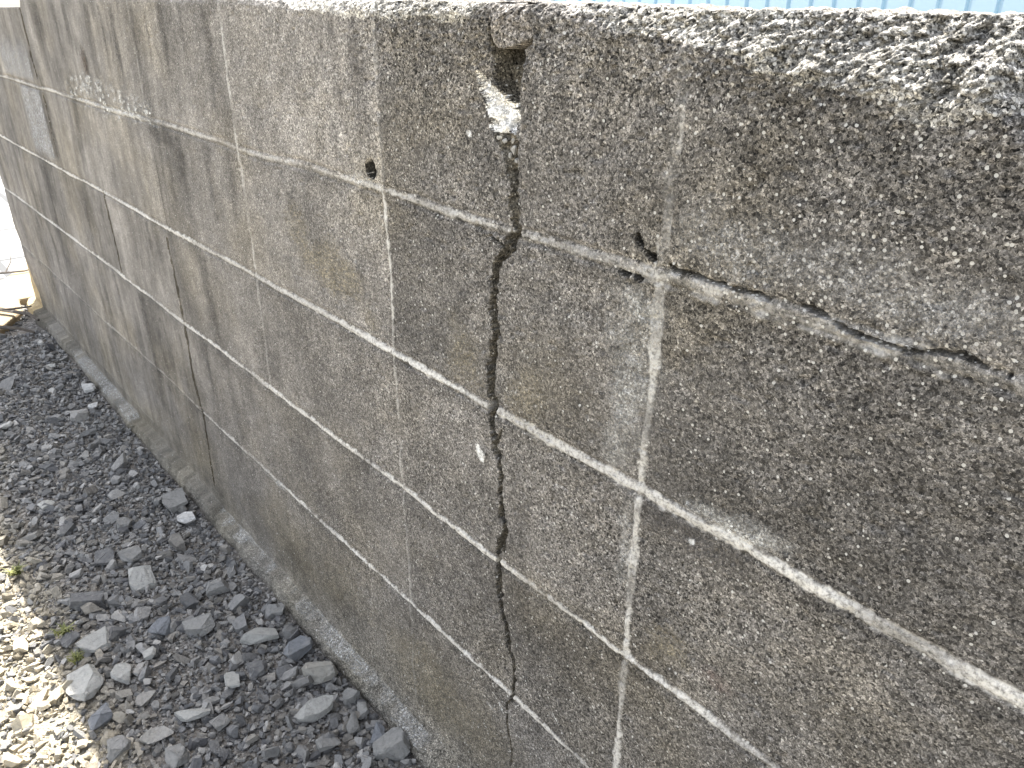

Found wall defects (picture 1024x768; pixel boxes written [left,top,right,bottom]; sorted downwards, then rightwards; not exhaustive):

spalling [283,0,535,182]
crack [669,263,772,303]
crack [801,303,1014,381]
crack [485,140,522,764]